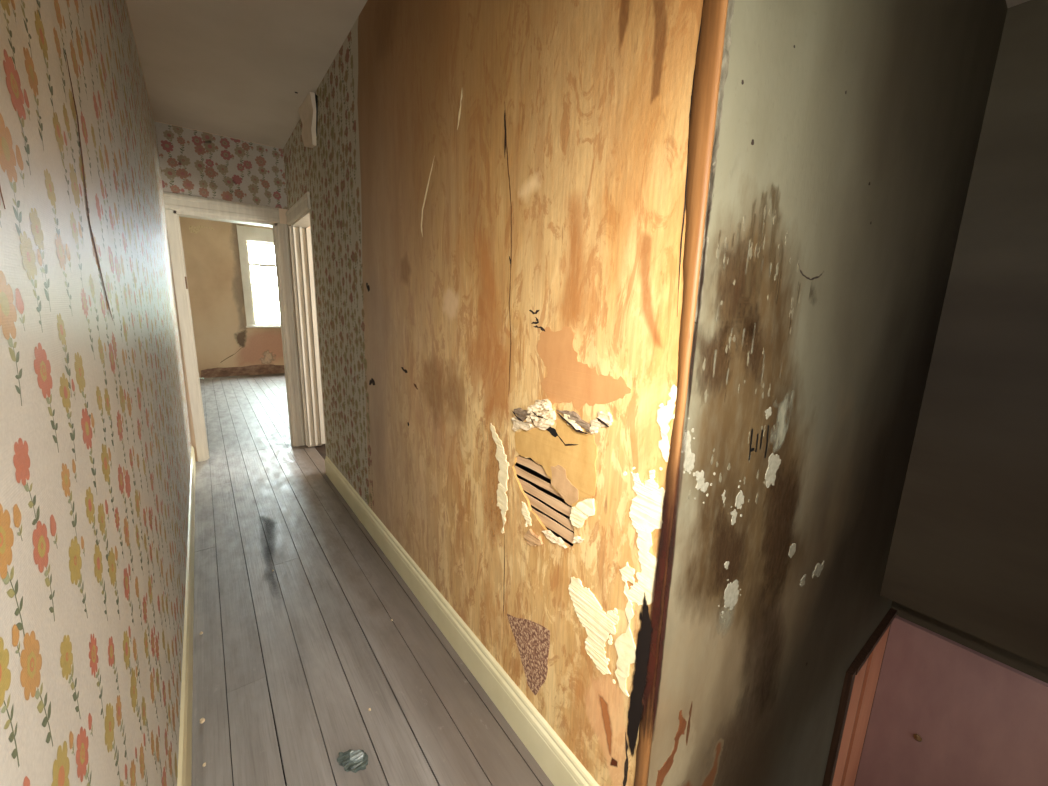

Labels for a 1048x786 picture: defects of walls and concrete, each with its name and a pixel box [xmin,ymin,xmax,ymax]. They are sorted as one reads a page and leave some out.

flaking render [490,326,631,548]
peeling [568,385,716,697]
spalling [718,561,741,627]
spalling [721,480,744,525]
water stain [642,152,824,786]
spalling [765,453,781,488]